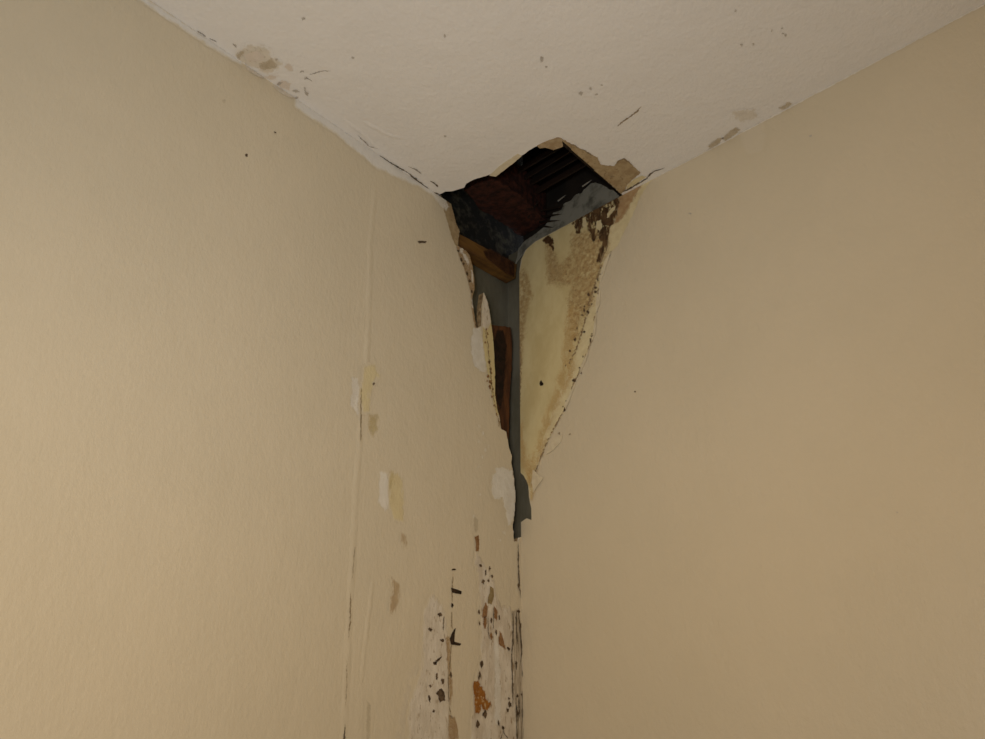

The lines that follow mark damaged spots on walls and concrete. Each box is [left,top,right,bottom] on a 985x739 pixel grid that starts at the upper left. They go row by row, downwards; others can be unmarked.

peeling [233,42,328,99]
leakage [519,266,534,375]
leakage [543,186,641,344]
peeling [478,425,519,542]
crack [347,549,355,638]
peeling [393,535,521,739]